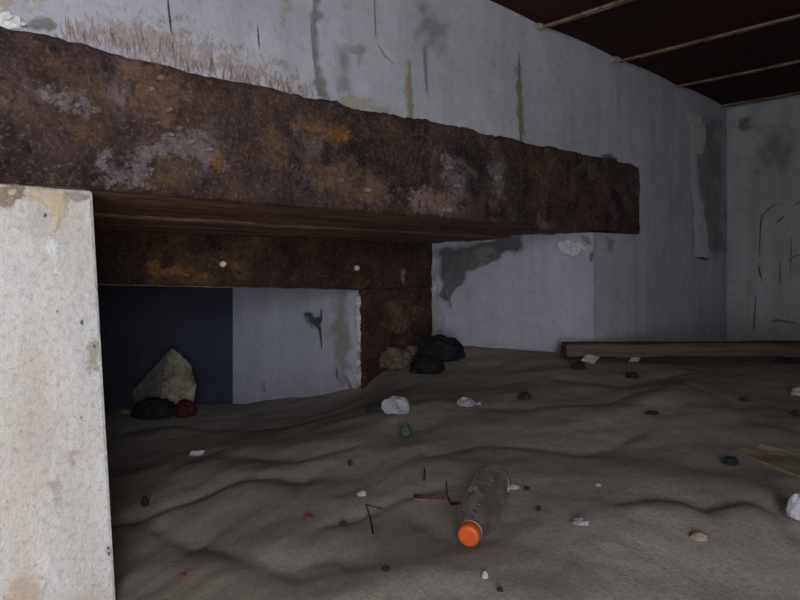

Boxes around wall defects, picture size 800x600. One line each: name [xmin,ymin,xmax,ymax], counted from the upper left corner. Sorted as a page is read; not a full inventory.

crack [166,0,174,53]
rust [52,11,316,98]
damp [311,0,327,97]
rust [41,86,100,119]
rust [516,62,524,141]
rust [97,127,230,188]
rust [399,151,469,216]
damp [440,236,522,307]
mould [305,310,322,349]